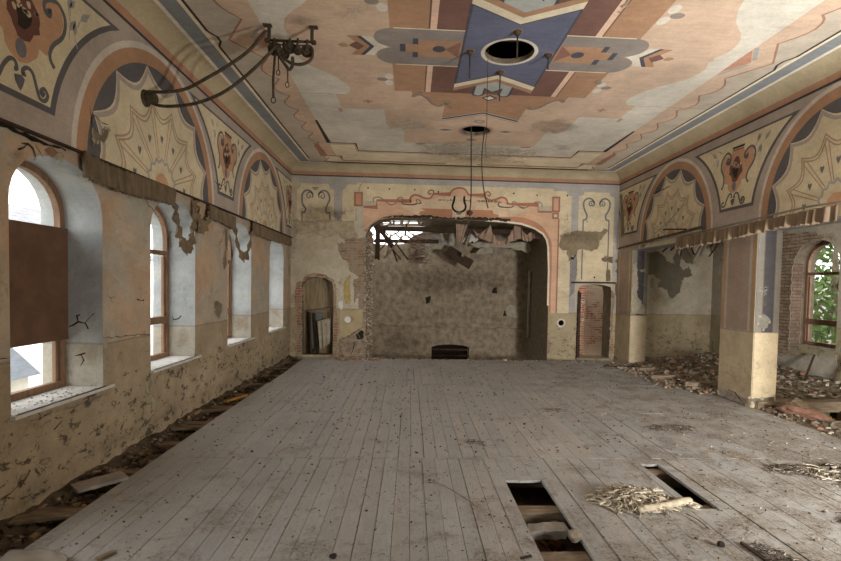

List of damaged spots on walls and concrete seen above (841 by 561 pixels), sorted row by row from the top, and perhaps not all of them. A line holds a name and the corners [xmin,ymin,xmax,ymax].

crack [68,313,149,338]
peeling [293,219,366,355]
peeling [559,228,618,361]
peeling [631,247,694,315]